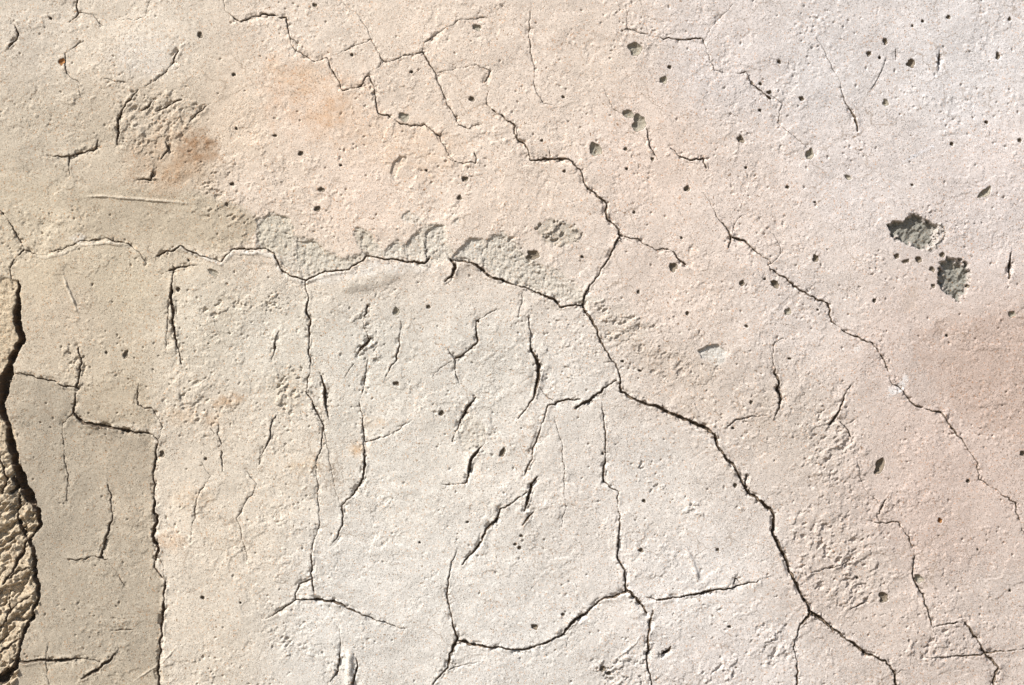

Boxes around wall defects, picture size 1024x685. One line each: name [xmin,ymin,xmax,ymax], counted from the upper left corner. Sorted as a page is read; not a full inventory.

spalling [0,277,43,685]
crack [16,347,166,685]
crack [65,0,149,93]
crack [52,51,179,174]
crack [1,211,429,629]
crack [224,4,901,685]
crack [706,197,1024,532]
spalling [886,213,972,303]
crack [857,463,1024,685]